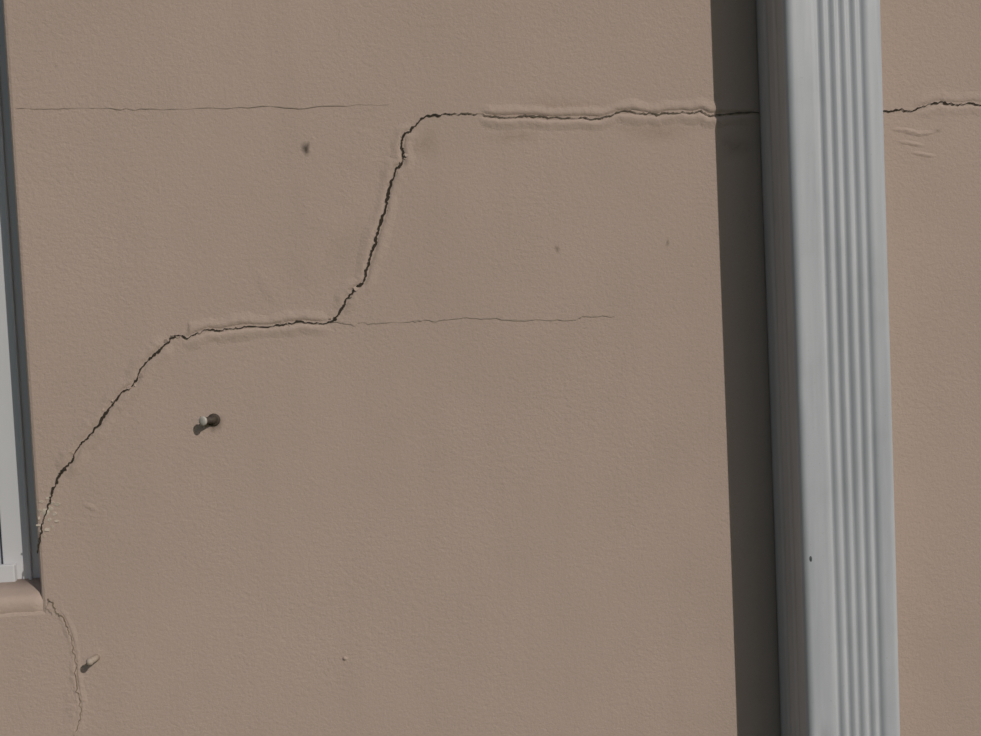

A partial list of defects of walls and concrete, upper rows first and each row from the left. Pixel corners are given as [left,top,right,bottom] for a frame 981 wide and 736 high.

crack [190,102,388,110]
crack [883,101,981,112]
crack [37,110,759,553]
crack [45,599,90,736]